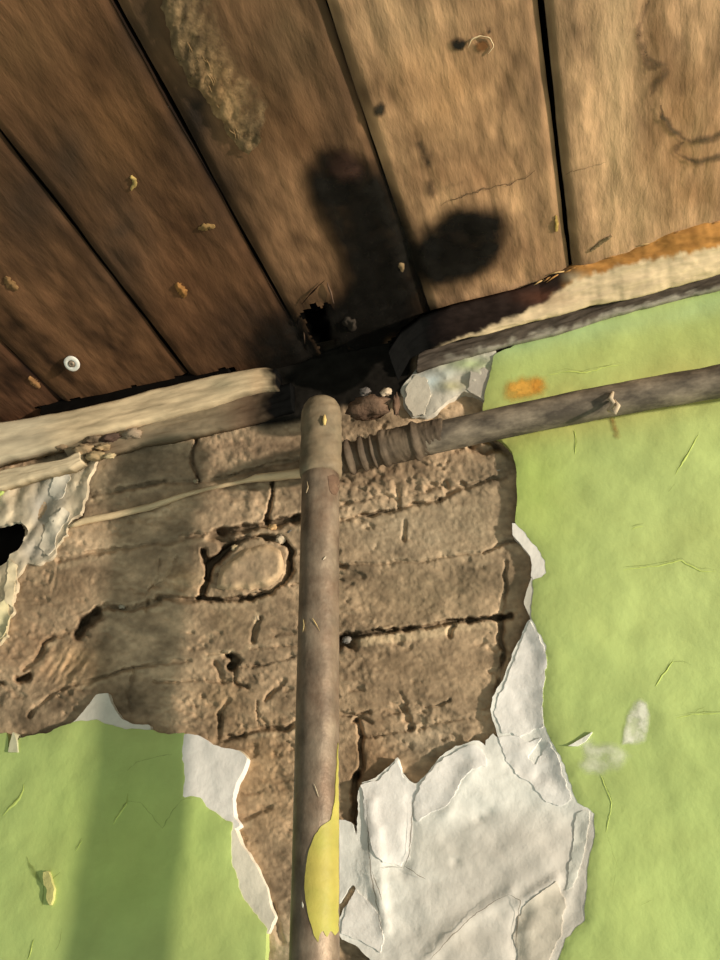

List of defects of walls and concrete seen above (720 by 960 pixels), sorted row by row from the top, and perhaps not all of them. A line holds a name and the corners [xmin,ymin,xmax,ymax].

crack [442,171,534,205]
corrosion [508,379,545,398]
spalling [0,420,302,960]
spalling [339,440,595,960]